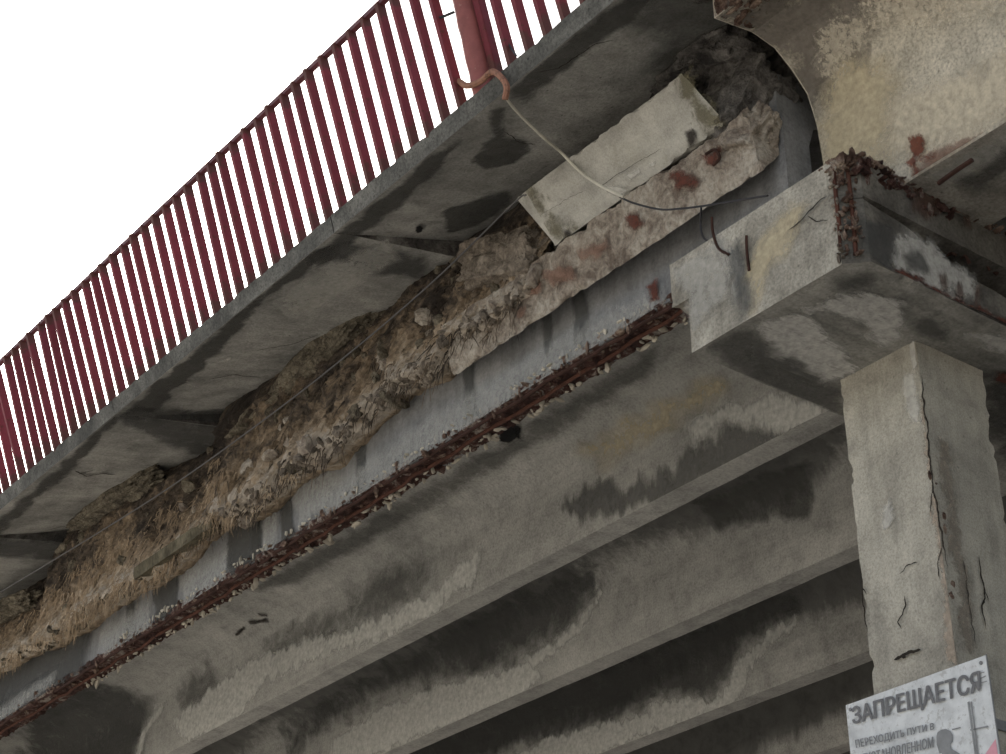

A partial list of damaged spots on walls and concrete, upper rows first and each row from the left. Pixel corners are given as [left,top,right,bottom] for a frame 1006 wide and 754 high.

corrosion [625,213,643,230]
corrosion [668,170,698,191]
spalling [818,133,1006,264]
corrosion [906,135,935,175]
damp [865,223,976,300]
spalling [0,111,779,740]
damp [564,277,903,528]
crack [894,380,988,660]
damp [22,685,165,754]
damp [173,551,480,742]
damp [282,570,797,754]
crack [860,564,868,632]